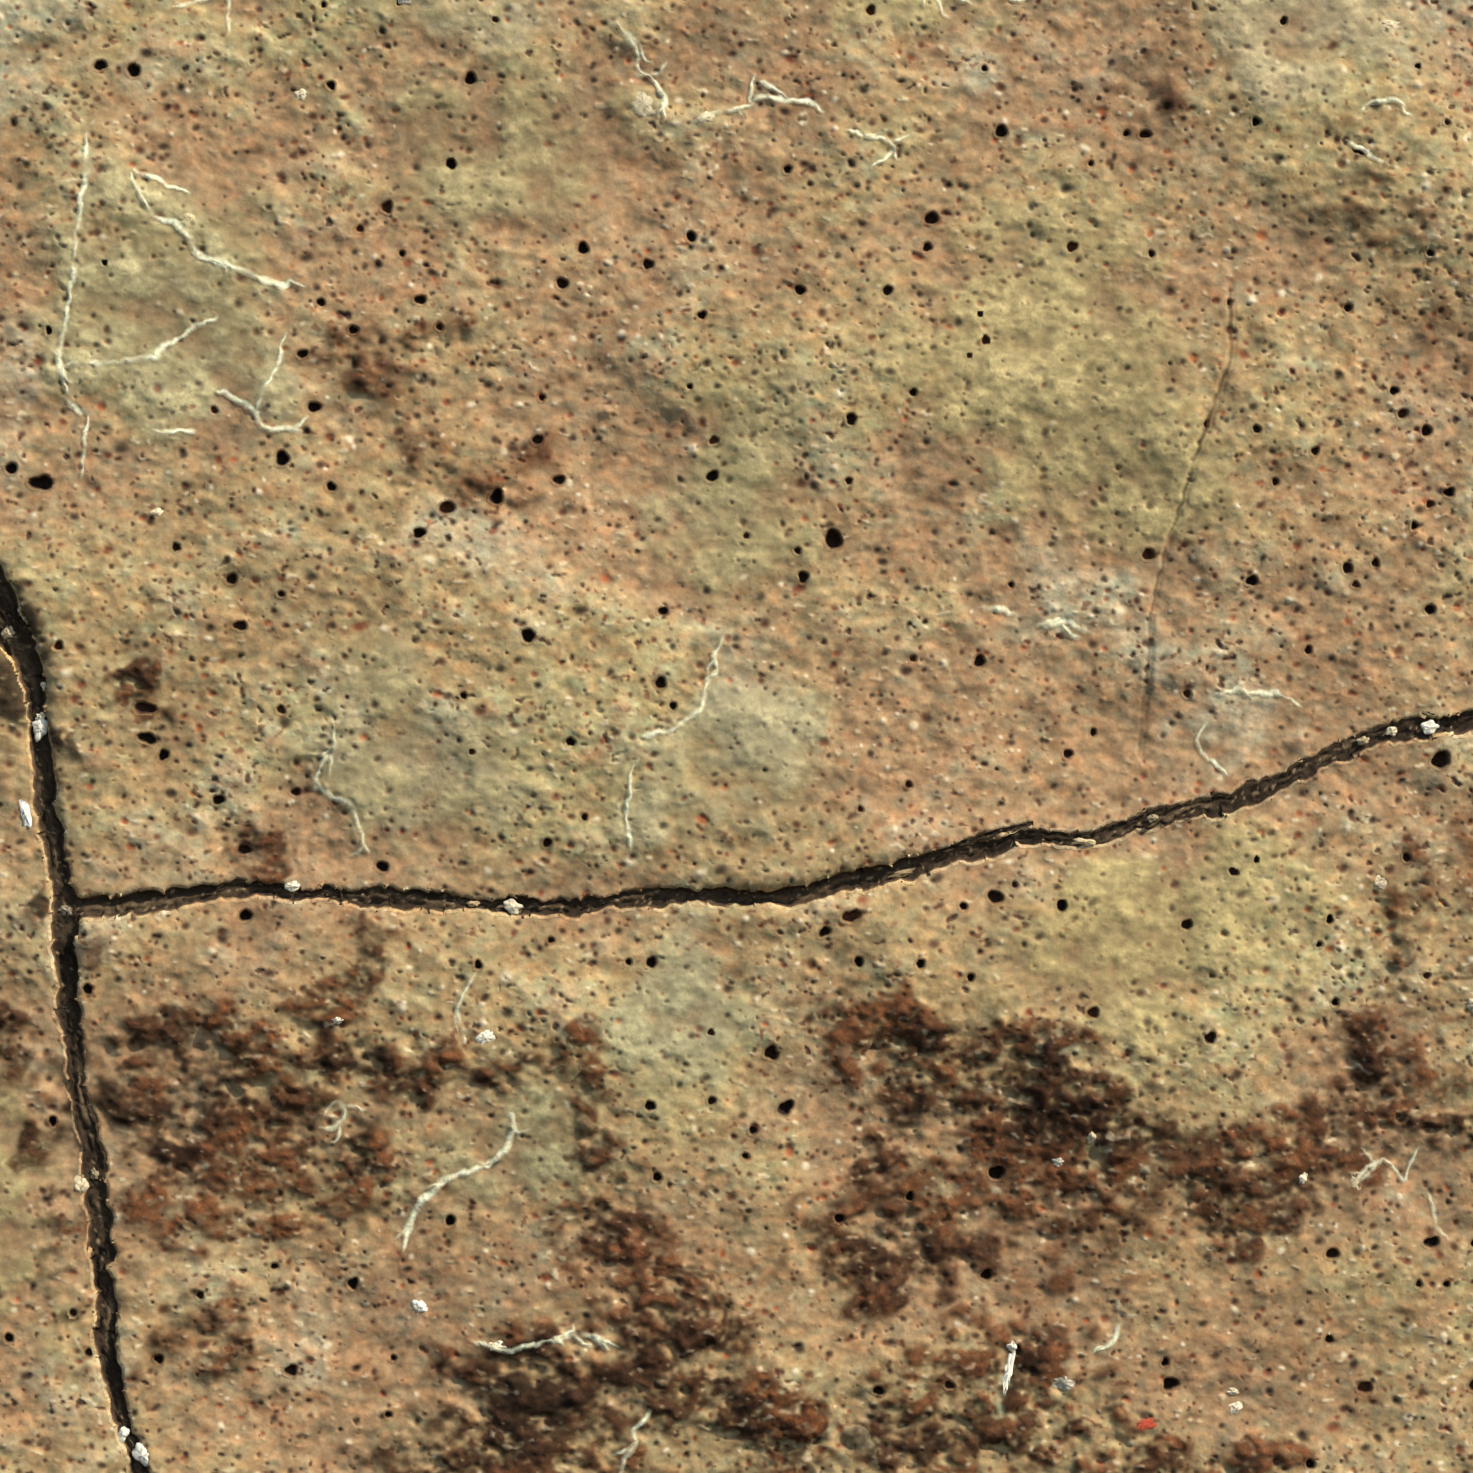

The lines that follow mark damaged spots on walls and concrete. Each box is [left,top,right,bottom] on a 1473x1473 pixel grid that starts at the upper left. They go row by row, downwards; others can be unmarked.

water stain [1018,833,1280,981]
crack [0,560,1473,1473]
water stain [1093,1000,1161,1056]
water stain [505,1082,594,1209]